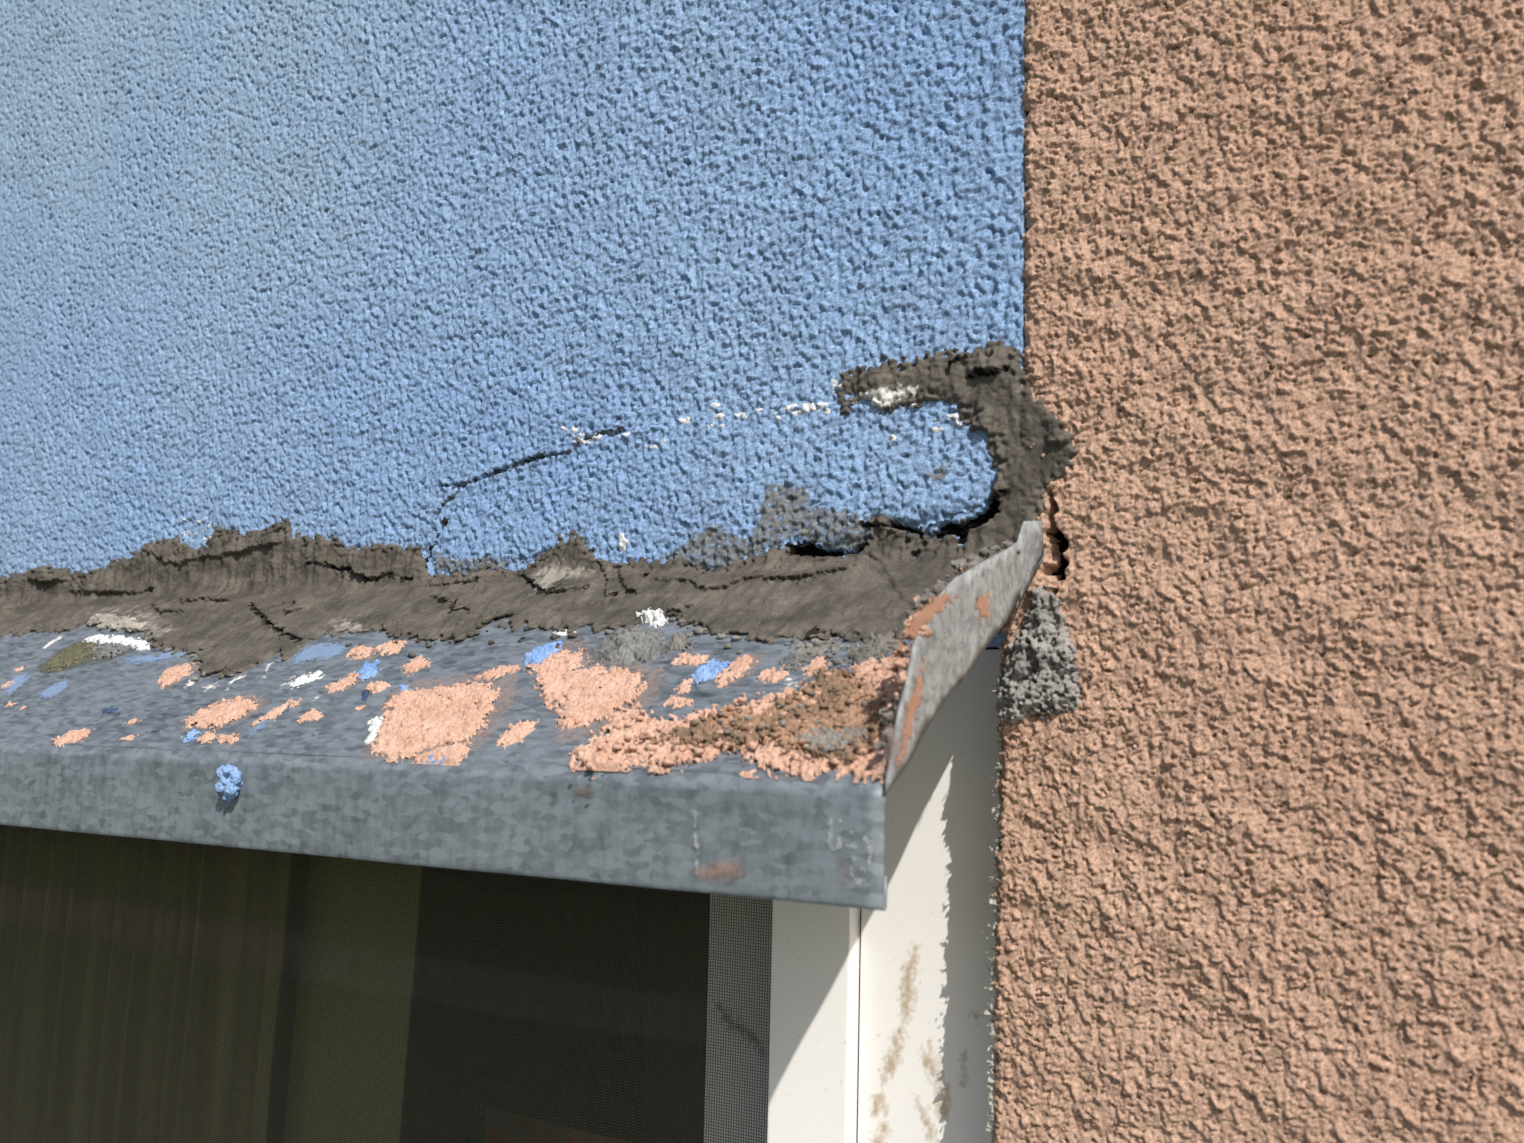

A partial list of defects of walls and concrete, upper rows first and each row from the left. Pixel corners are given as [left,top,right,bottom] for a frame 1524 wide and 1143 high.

peeling [677,377,844,429]
peeling [905,401,967,433]
peeling [561,426,603,445]
peeling [927,462,953,488]
crack [304,425,625,614]
peeling [618,533,628,552]
peeling [658,484,873,572]
peeling [434,550,509,574]
crack [248,602,302,642]
peeling [374,640,408,656]